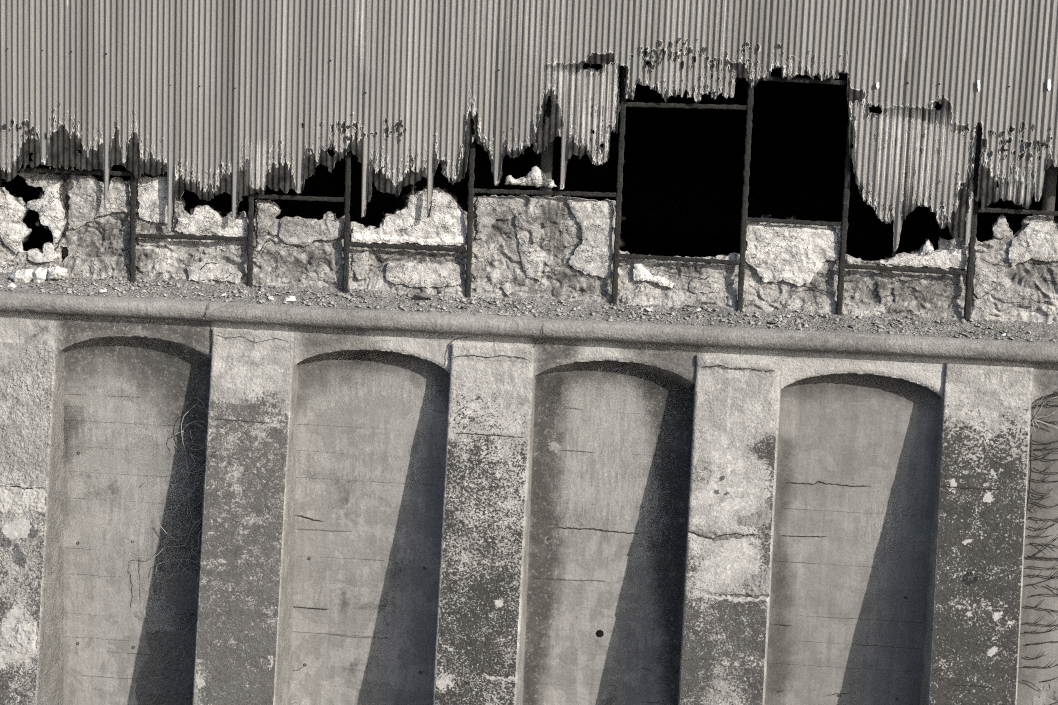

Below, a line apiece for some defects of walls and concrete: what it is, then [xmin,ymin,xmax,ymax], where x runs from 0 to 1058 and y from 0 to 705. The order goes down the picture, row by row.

flaking render [187,261,243,310]
flaking render [0,176,523,279]
flaking render [385,261,462,288]
flaking render [488,282,514,304]
flaking render [516,231,545,281]
flaking render [567,200,615,278]
flaking render [633,264,674,288]
flaking render [745,222,841,286]
flaking render [882,218,1058,303]
crack [686,530,828,542]